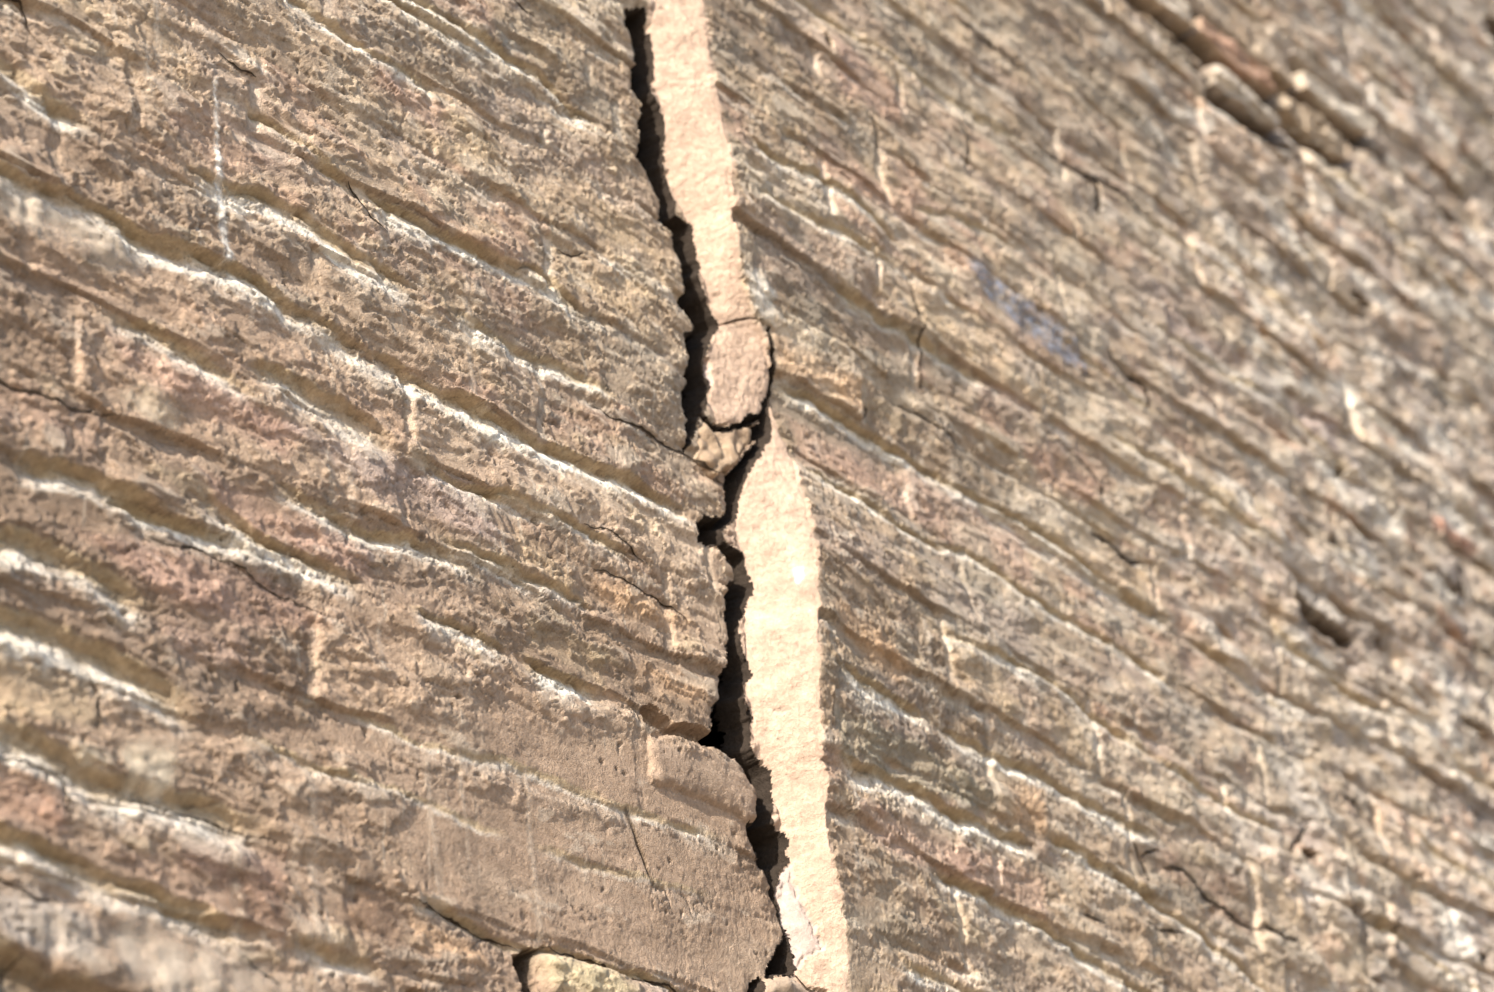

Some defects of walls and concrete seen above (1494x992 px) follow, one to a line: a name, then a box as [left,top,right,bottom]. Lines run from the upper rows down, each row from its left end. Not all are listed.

crack [865,109,880,159]
spalling [1124,0,1376,170]
crack [586,7,815,992]
crack [1133,841,1298,941]
crack [411,895,676,992]